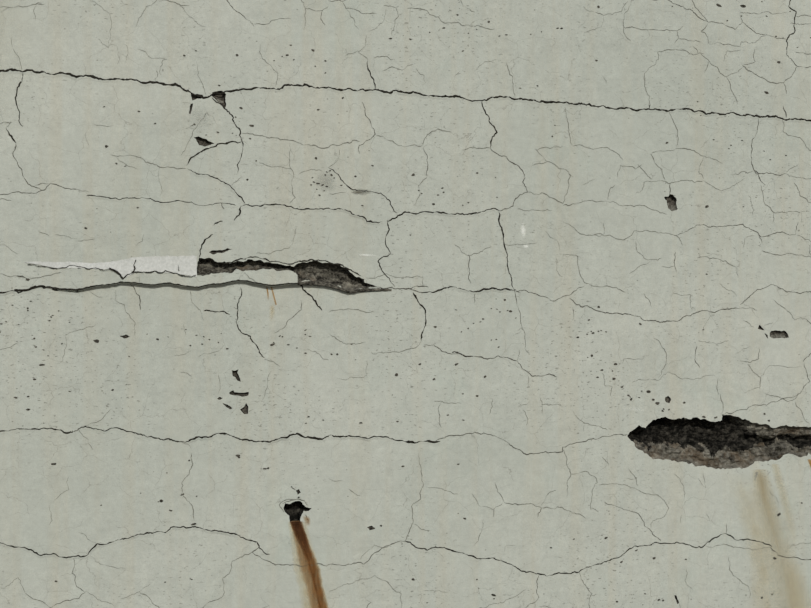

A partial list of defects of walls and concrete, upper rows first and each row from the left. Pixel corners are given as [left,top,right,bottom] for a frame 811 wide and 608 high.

crack [0,0,811,425]
peeling [664,194,677,211]
spalling [26,248,374,290]
spalling [590,363,811,469]
crack [0,398,811,608]
corrosion [291,519,327,608]